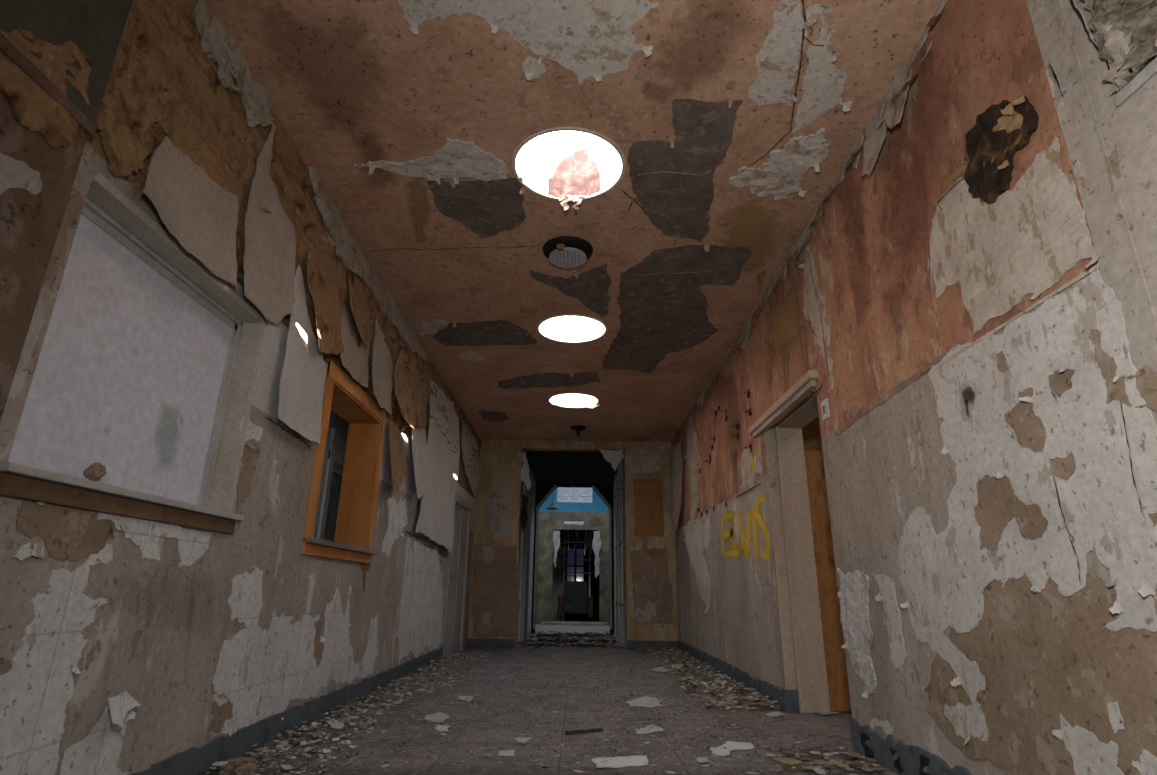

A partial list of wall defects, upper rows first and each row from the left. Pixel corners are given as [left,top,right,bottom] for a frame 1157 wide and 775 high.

spalling [0,0,537,663]
peeling [398,0,659,86]
spalling [498,0,854,389]
peeling [834,137,1157,775]
spalling [983,95,1025,170]
peeling [0,500,212,775]
peeling [204,566,378,739]